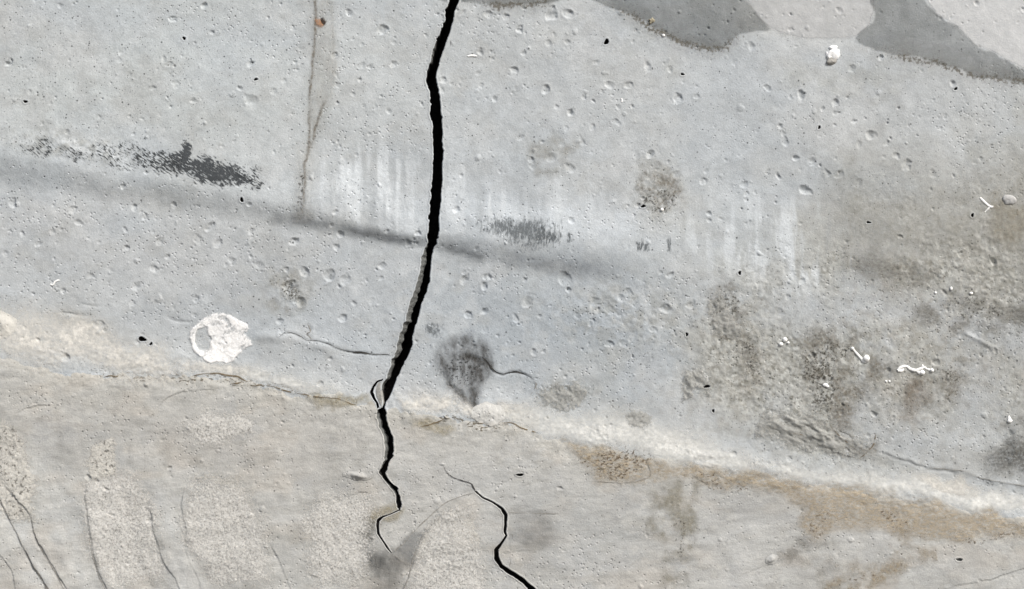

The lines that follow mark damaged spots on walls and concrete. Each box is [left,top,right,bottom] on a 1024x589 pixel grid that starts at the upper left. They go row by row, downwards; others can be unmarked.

damp [618,6,737,52]
damp [891,55,1024,84]
damp [142,140,192,176]
crack [101,0,552,589]
damp [778,466,1024,513]